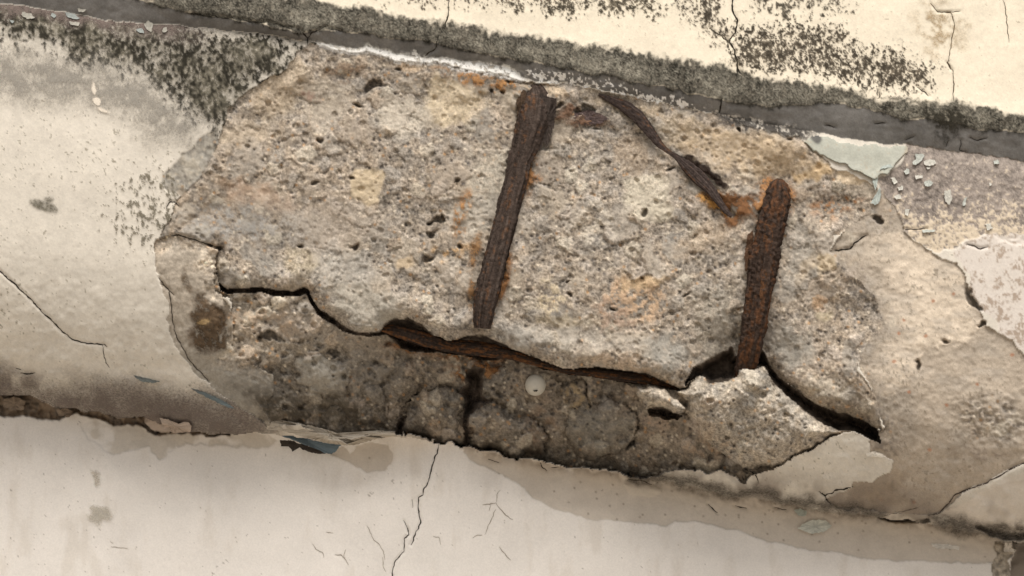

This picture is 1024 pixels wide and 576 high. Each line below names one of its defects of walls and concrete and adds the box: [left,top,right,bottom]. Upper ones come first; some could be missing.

water stain [0,5,763,146]
water stain [407,0,936,95]
crack [930,3,958,101]
water stain [922,106,967,139]
crack [0,271,109,367]
spalling [155,44,1024,515]
crack [368,444,441,576]
crack [473,491,513,559]